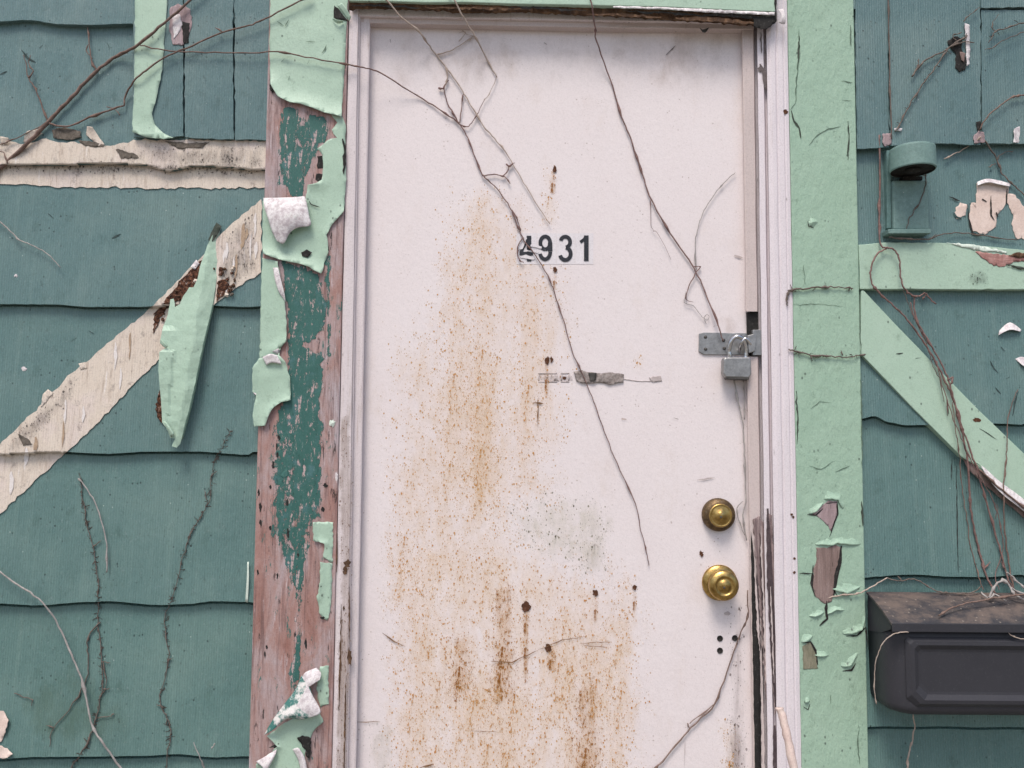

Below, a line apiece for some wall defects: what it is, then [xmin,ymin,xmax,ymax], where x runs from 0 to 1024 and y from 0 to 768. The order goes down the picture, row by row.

peeling [949,179,1024,270]
peeling [0,0,351,768]
corrosion [381,185,655,768]
peeling [800,491,860,669]
peeling [841,616,868,671]